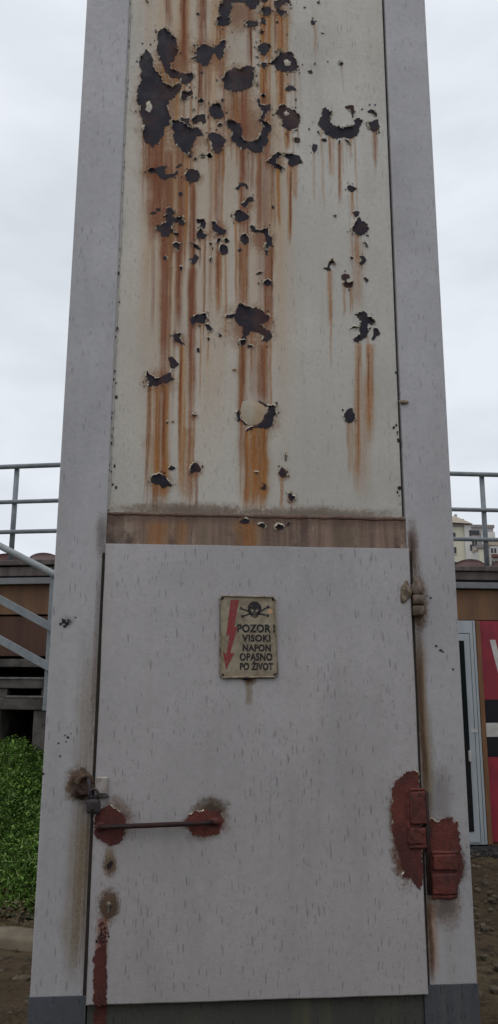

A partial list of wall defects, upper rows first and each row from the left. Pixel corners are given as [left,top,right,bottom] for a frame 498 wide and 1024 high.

rust [169,0,204,59]
rust [240,149,262,220]
peeling [135,0,380,291]
rust [148,144,195,478]
peeling [143,283,222,393]
peeling [349,310,380,343]
peeling [223,302,279,491]
rust [244,428,268,499]
rust [93,804,130,876]
rust [185,797,226,837]
rust [390,770,464,889]
rust [92,890,118,1024]